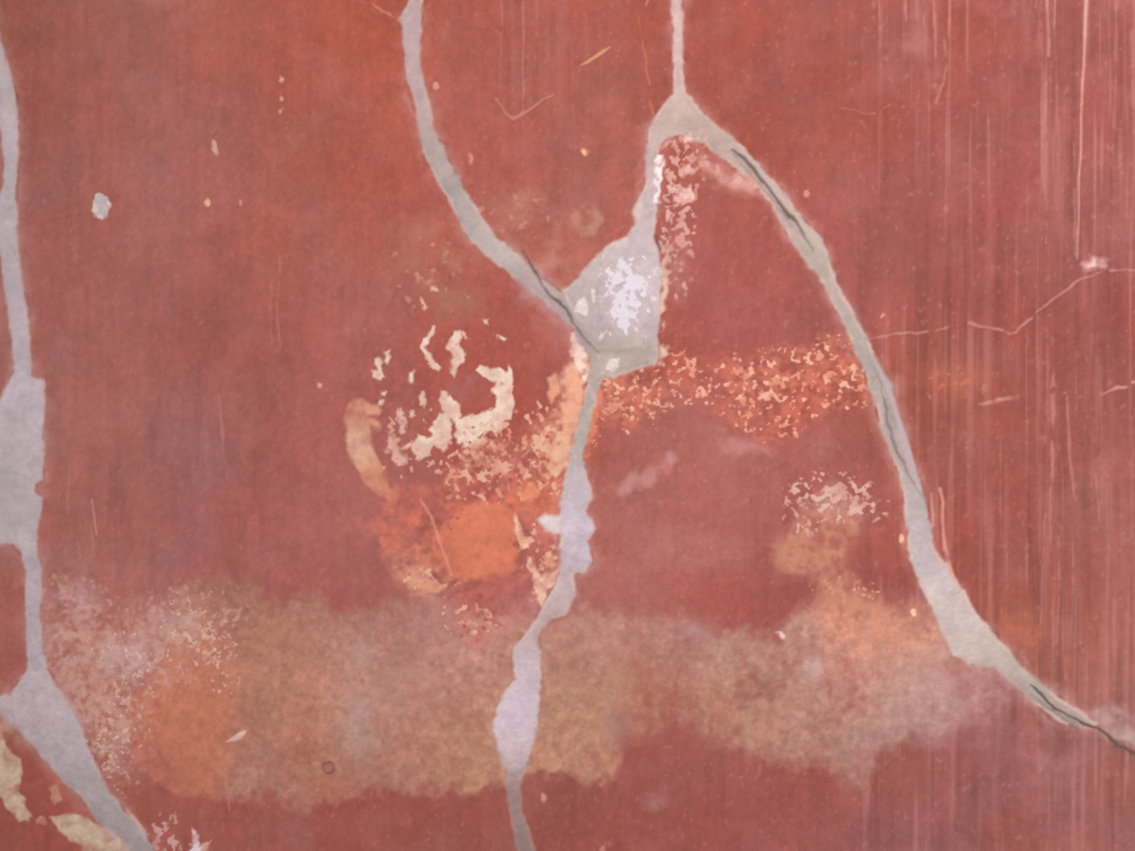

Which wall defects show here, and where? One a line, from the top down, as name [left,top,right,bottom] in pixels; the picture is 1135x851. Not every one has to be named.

peeling [0,720,116,851]
crack [0,0,165,851]
damp [49,464,522,851]
peeling [327,285,587,658]
crack [358,0,610,851]
damp [609,448,681,506]
peeling [587,327,865,462]
damp [714,435,779,460]
damp [529,522,1101,818]
crack [623,0,1135,759]